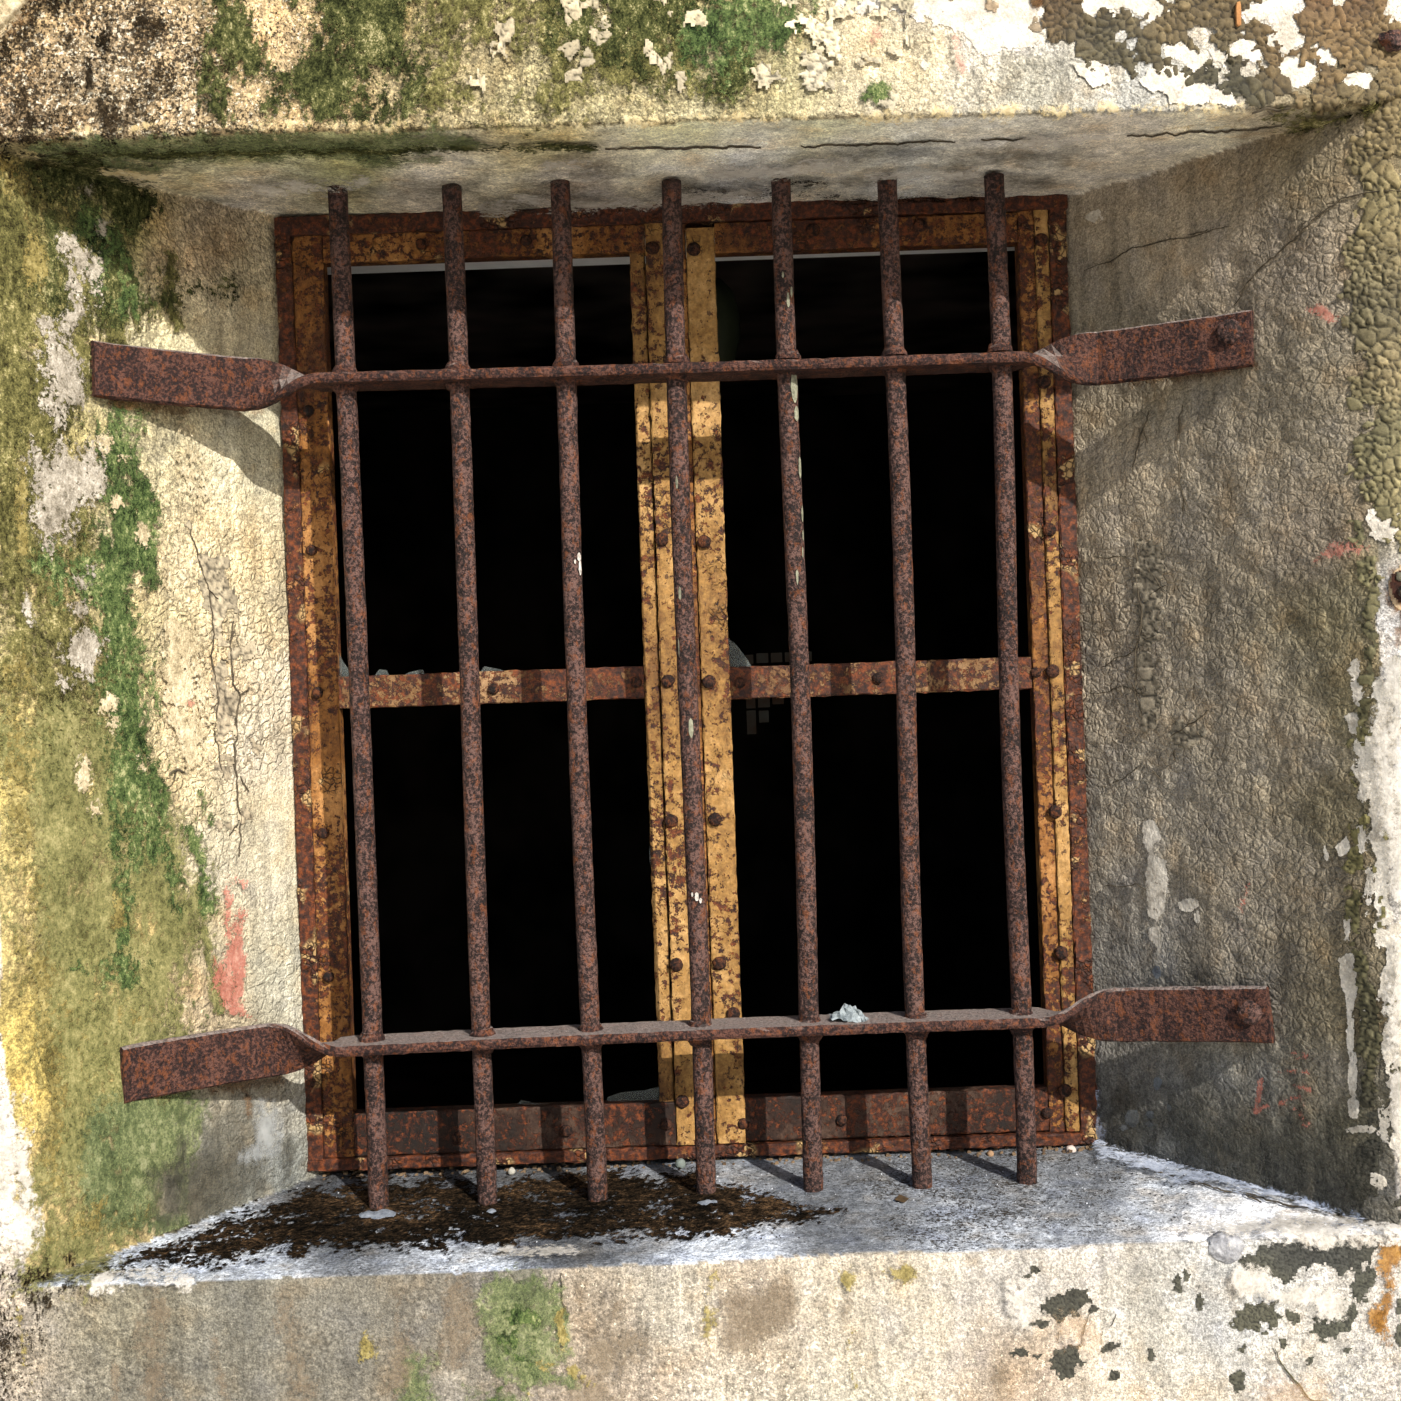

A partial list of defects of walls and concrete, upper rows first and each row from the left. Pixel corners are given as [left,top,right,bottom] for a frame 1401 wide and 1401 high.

crack [1084,226,1231,271]
crack [1233,190,1401,306]
crack [1132,405,1188,511]
water stain [130,464,163,595]
peeling [750,0,1401,1207]
crack [1090,535,1208,783]
water stain [163,789,225,1025]
water stain [1094,1090,1401,1250]
water stain [497,1244,579,1257]
peeling [1010,1344,1087,1381]
peeling [1028,1288,1100,1329]
peeling [1208,1231,1382,1393]